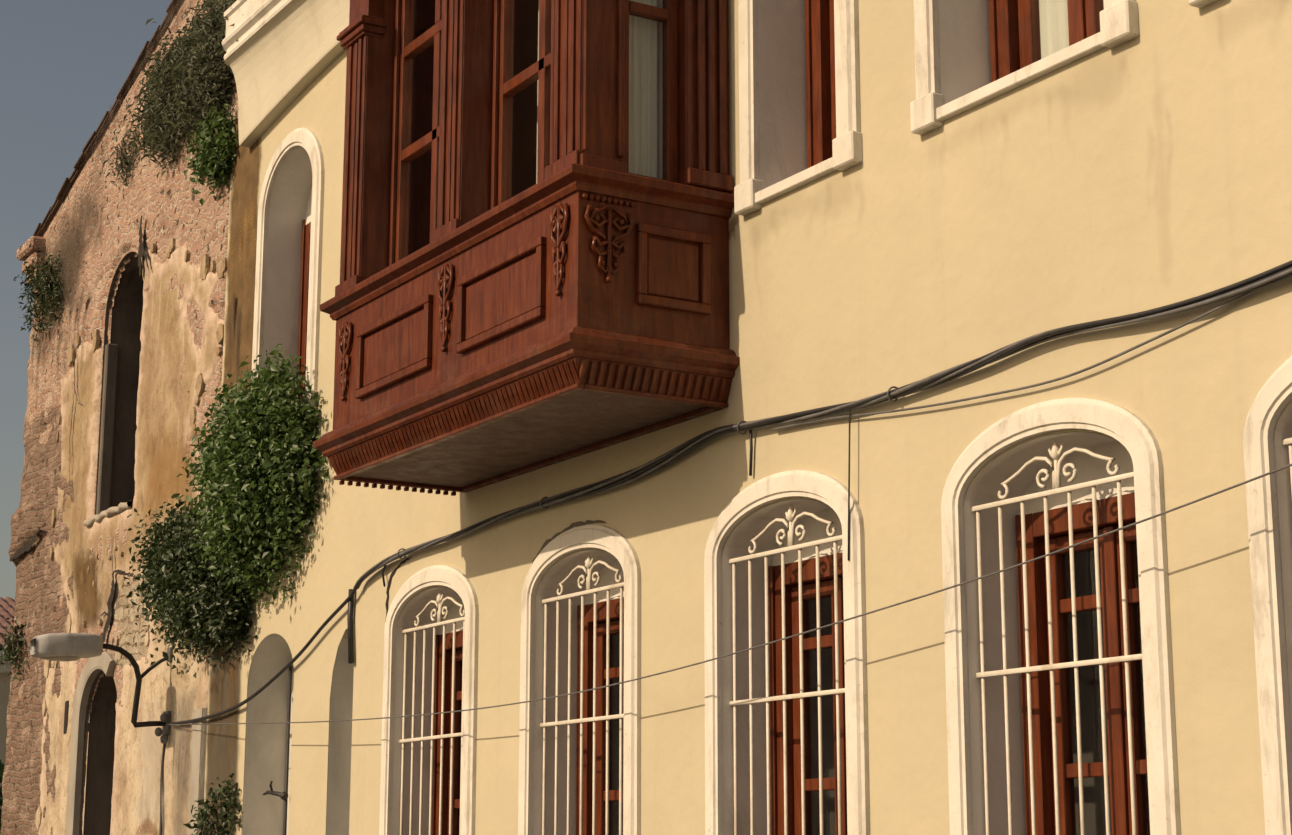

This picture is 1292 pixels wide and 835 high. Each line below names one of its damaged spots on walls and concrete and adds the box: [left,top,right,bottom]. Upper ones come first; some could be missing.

spalling [0,0,238,835]